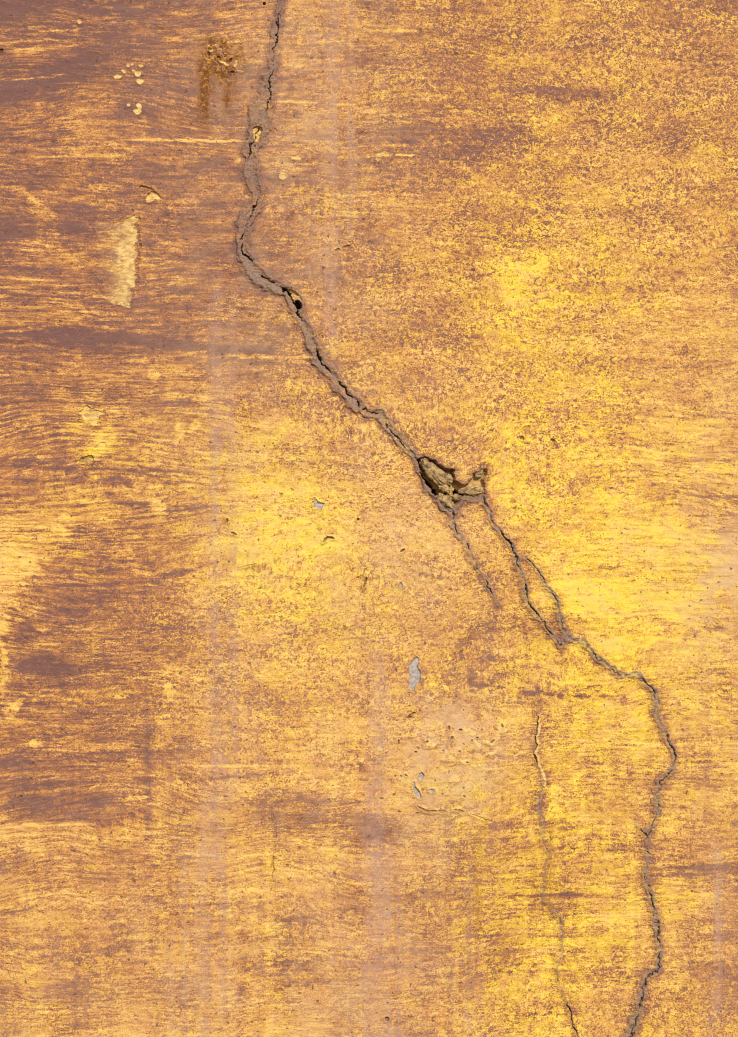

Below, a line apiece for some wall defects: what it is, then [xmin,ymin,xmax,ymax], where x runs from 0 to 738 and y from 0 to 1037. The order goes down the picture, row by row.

flaking render [90,183,164,310]
crack [232,0,682,1037]
peeling [403,707,424,721]
peeling [406,654,424,694]
peeling [395,720,510,826]